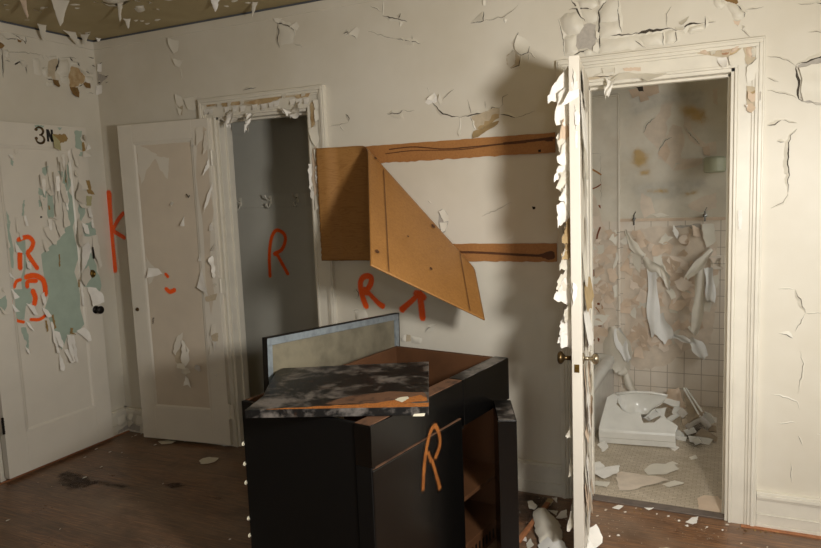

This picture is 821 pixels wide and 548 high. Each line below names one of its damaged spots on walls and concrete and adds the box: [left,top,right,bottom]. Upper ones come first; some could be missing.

peeling [0,42,108,97]
peeling [51,0,101,45]
crack [343,2,421,45]
crack [471,0,518,23]
peeling [506,33,536,70]
flaking render [558,0,623,56]
crack [387,88,536,138]
peeling [204,92,319,210]
crack [768,119,797,208]
peeling [0,127,104,371]
peeling [547,67,719,548]
crack [773,287,820,445]